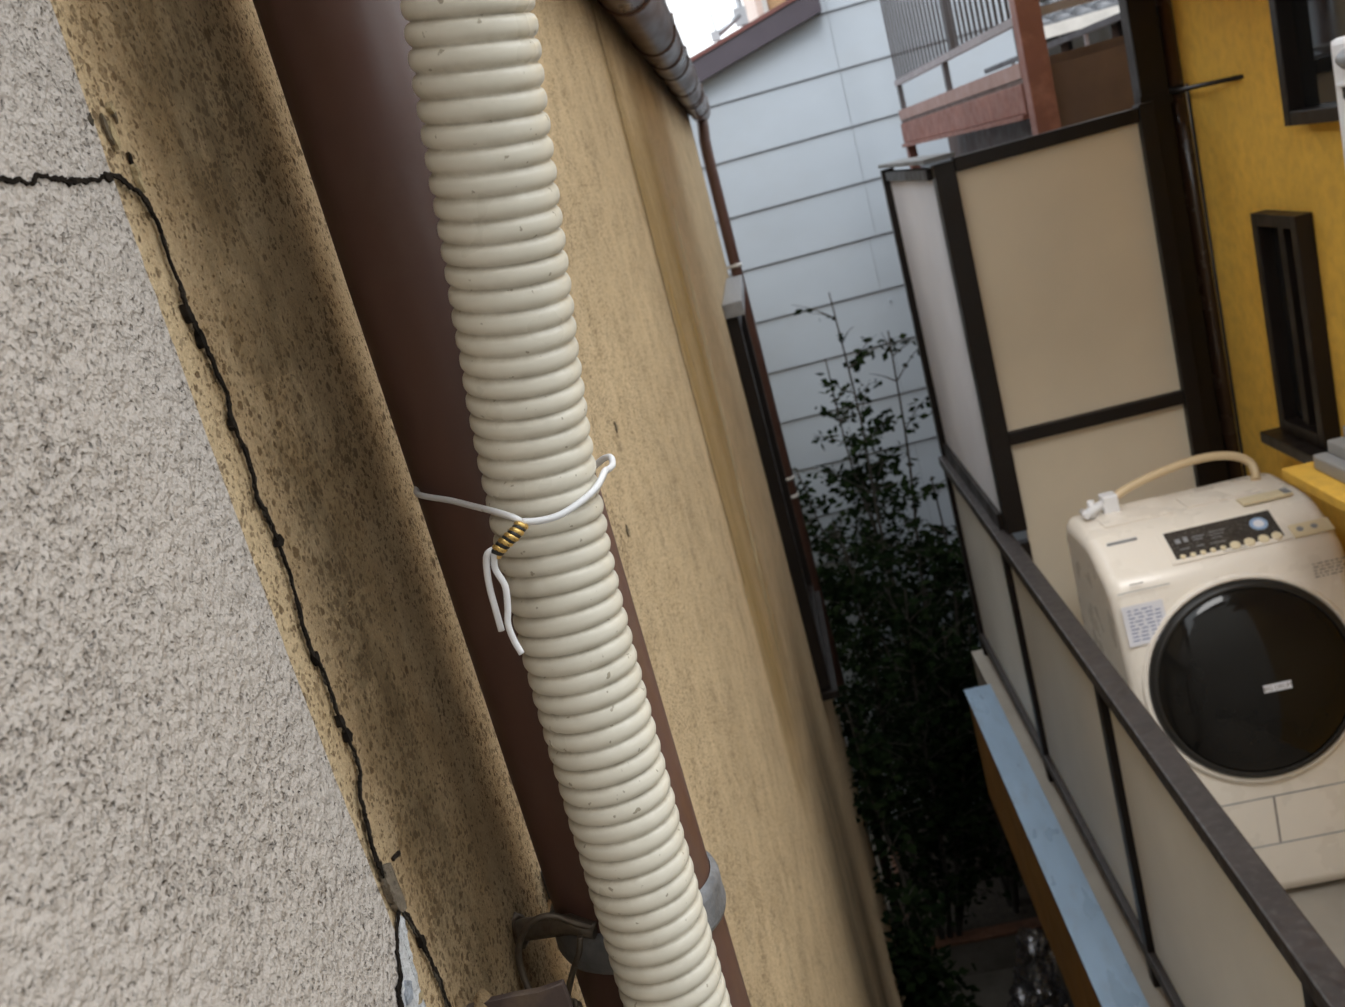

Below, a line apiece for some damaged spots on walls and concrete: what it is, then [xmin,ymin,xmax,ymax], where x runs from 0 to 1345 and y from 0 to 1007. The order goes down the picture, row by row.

crack [0,171,452,1007]
spalling [396,915,426,1007]